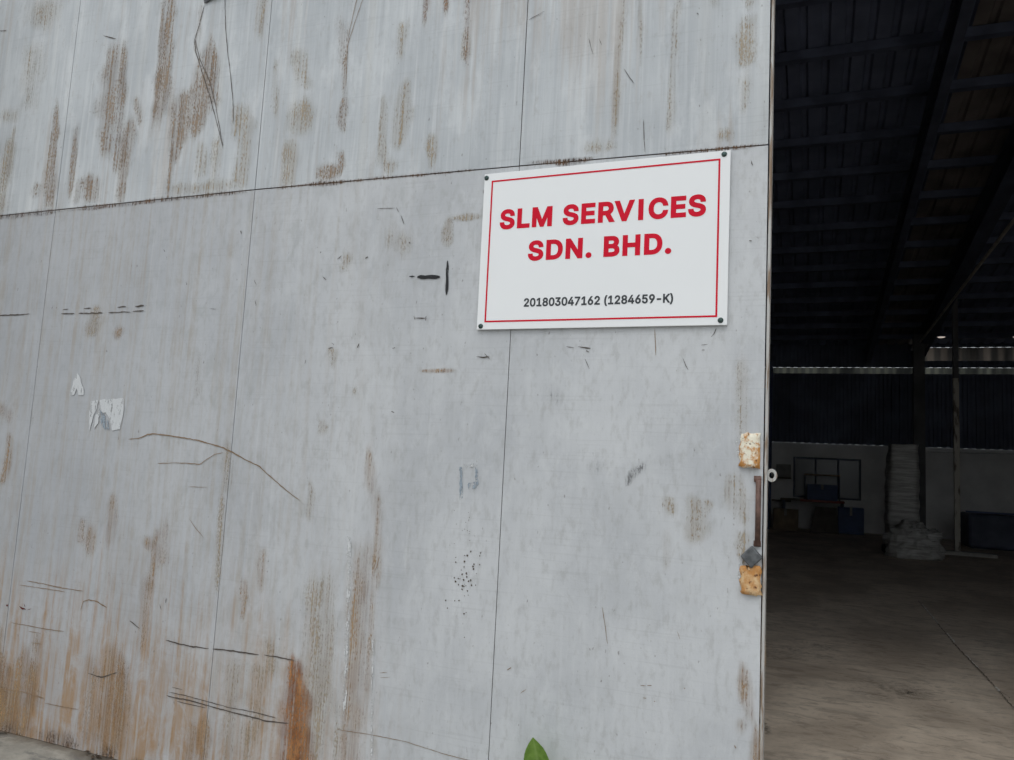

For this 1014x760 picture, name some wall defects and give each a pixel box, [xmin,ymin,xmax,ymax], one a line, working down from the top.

corrosion [0,107,59,217]
corrosion [69,0,248,210]
corrosion [282,144,344,189]
corrosion [374,116,450,179]
peeling [89,398,124,431]
corrosion [280,582,334,760]
corrosion [335,557,379,755]
crack [918,601,1014,708]